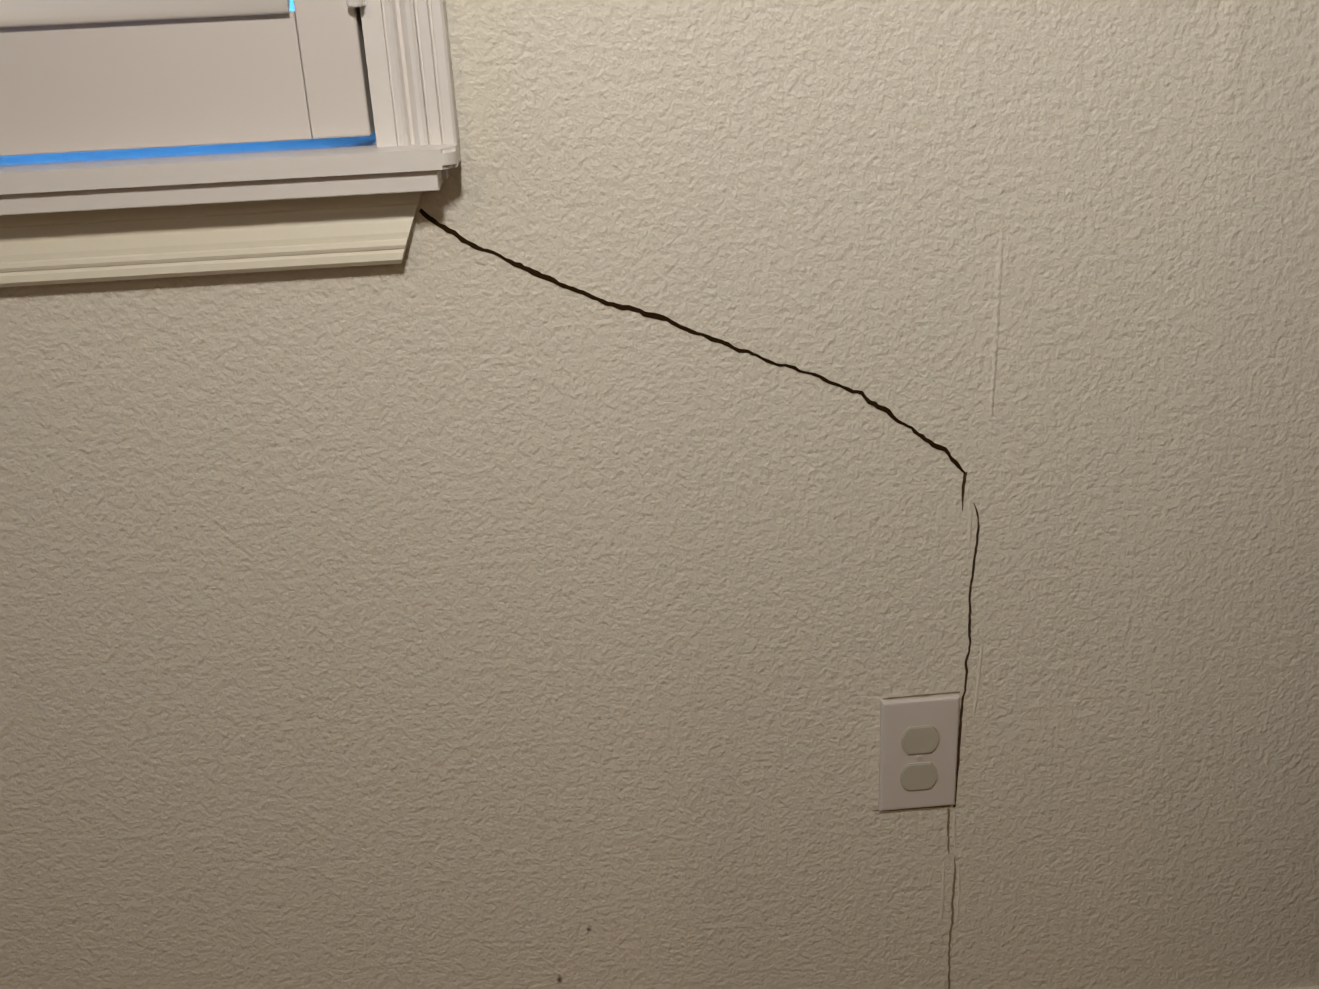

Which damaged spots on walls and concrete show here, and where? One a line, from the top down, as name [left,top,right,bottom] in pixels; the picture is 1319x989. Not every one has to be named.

crack [419,208,983,989]